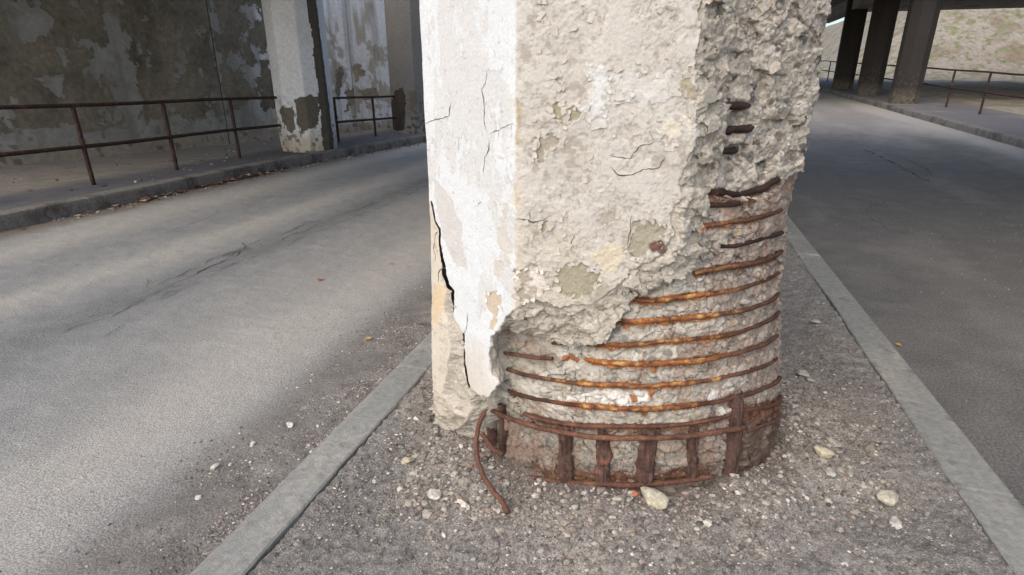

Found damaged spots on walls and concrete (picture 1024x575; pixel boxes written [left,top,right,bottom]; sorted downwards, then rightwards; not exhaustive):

peeling [0,0,379,150]
crack [481,73,513,171]
crack [611,133,666,176]
corrosion [701,176,781,233]
spalling [432,0,832,493]
corrosion [649,240,667,254]
corrosion [619,251,777,329]
corrosion [529,330,781,435]
corrosion [610,470,636,483]
corrosion [653,466,708,482]